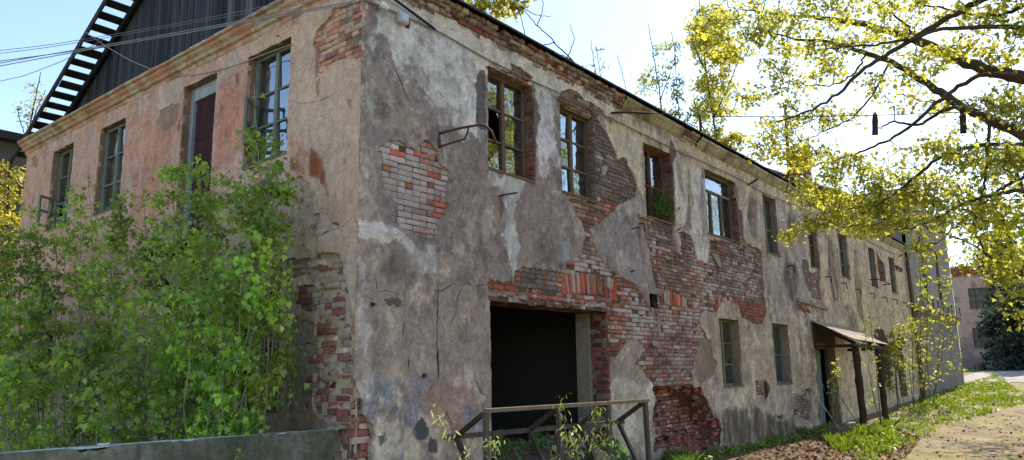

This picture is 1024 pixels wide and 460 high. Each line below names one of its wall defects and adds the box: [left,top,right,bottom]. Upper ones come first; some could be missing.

flaking render [315,2,368,73]
flaking render [378,140,449,238]
flaking render [407,0,766,440]
flaking render [201,176,385,460]
crack [430,283,483,389]
flaking render [797,258,821,313]
flaking render [755,380,811,421]